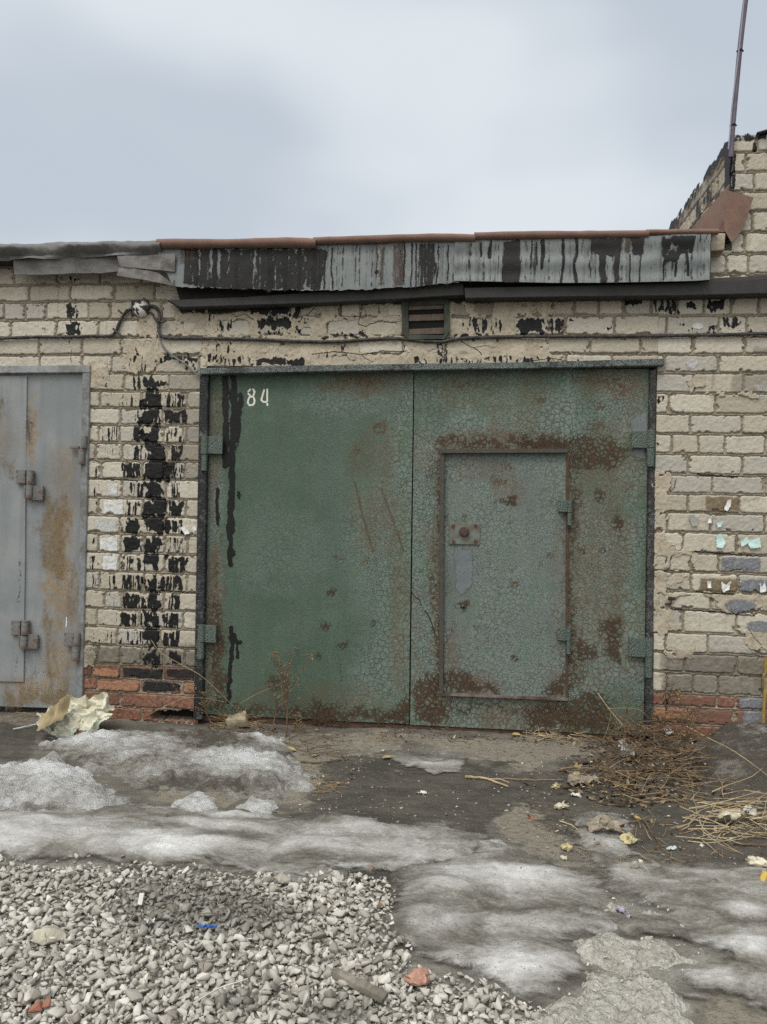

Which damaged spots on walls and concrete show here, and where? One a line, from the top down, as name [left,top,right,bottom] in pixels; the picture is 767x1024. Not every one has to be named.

spalling [408,307,444,335]
corrosion [438,422,629,562]
corrosion [209,559,622,733]